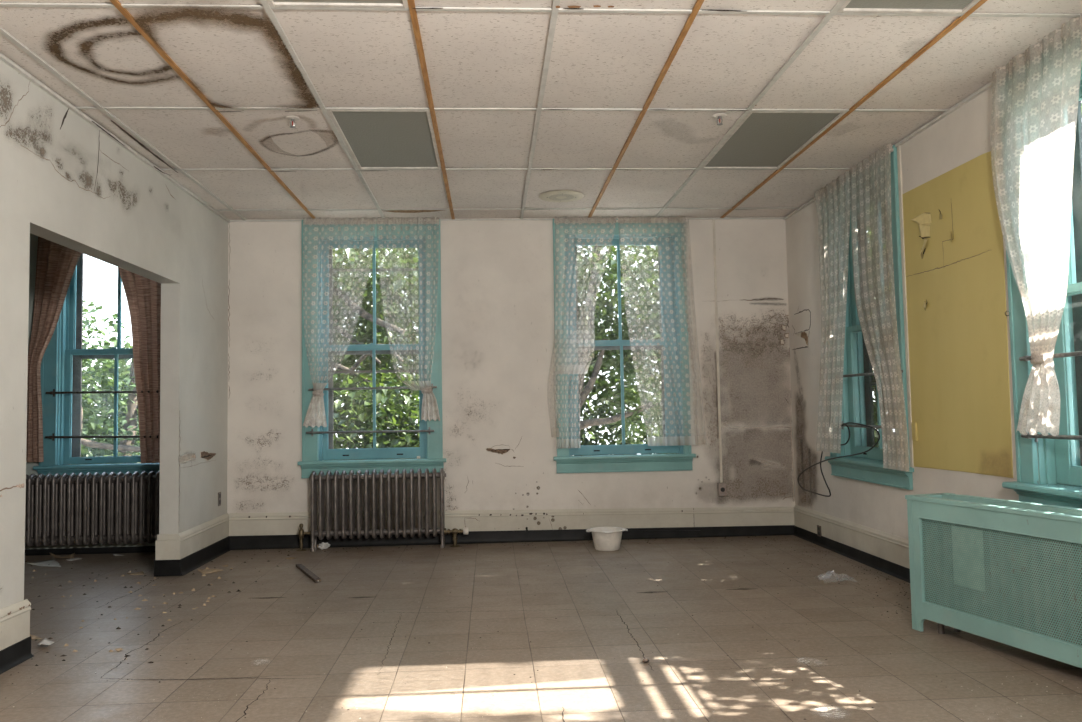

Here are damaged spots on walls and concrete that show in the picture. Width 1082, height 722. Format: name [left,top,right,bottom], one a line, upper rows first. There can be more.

damp [46,9,318,109]
damp [701,310,816,504]
spalling [200,450,217,461]
spalling [485,445,516,459]
crack [101,621,197,680]
crack [236,678,300,722]